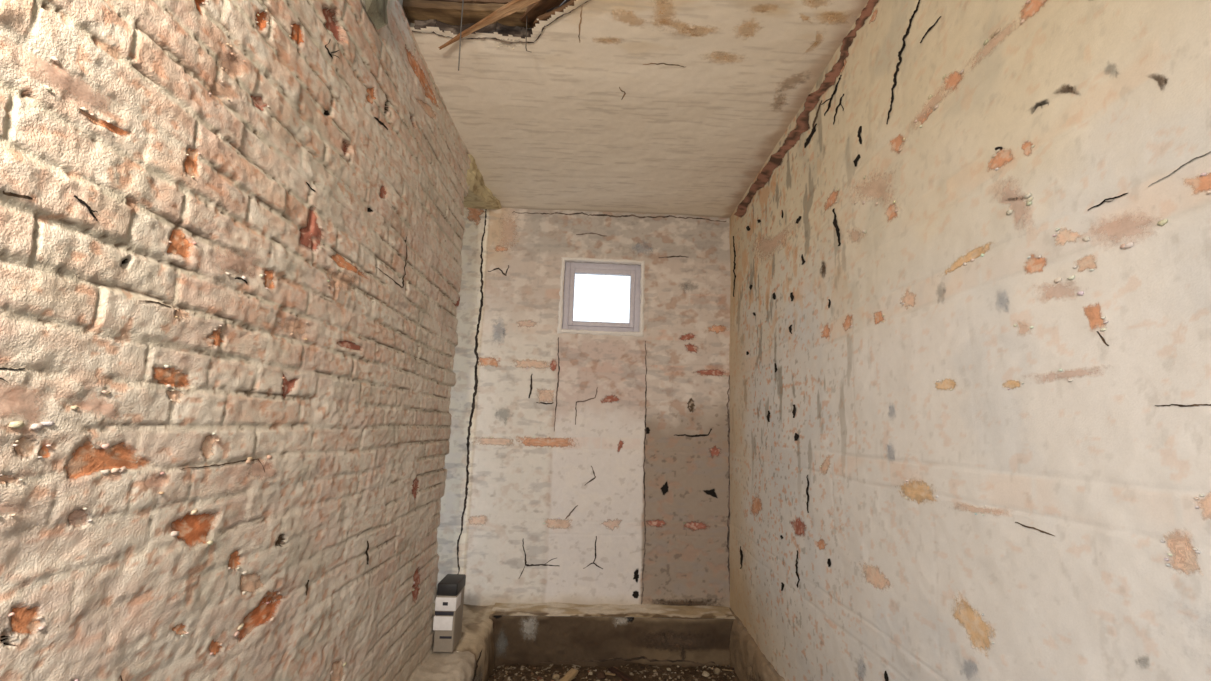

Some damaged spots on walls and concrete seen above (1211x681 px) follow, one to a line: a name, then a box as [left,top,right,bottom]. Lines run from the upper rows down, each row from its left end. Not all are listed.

spalling [734,0,878,217]
crack [804,0,941,167]
crack [832,208,841,246]
crack [376,237,407,288]
flaking render [0,386,56,458]
crack [457,209,802,604]
spalling [68,508,93,527]
spalling [65,438,165,494]
spalling [171,508,218,546]
crack [803,475,811,513]
spalling [208,551,282,655]
spalling [953,600,994,650]